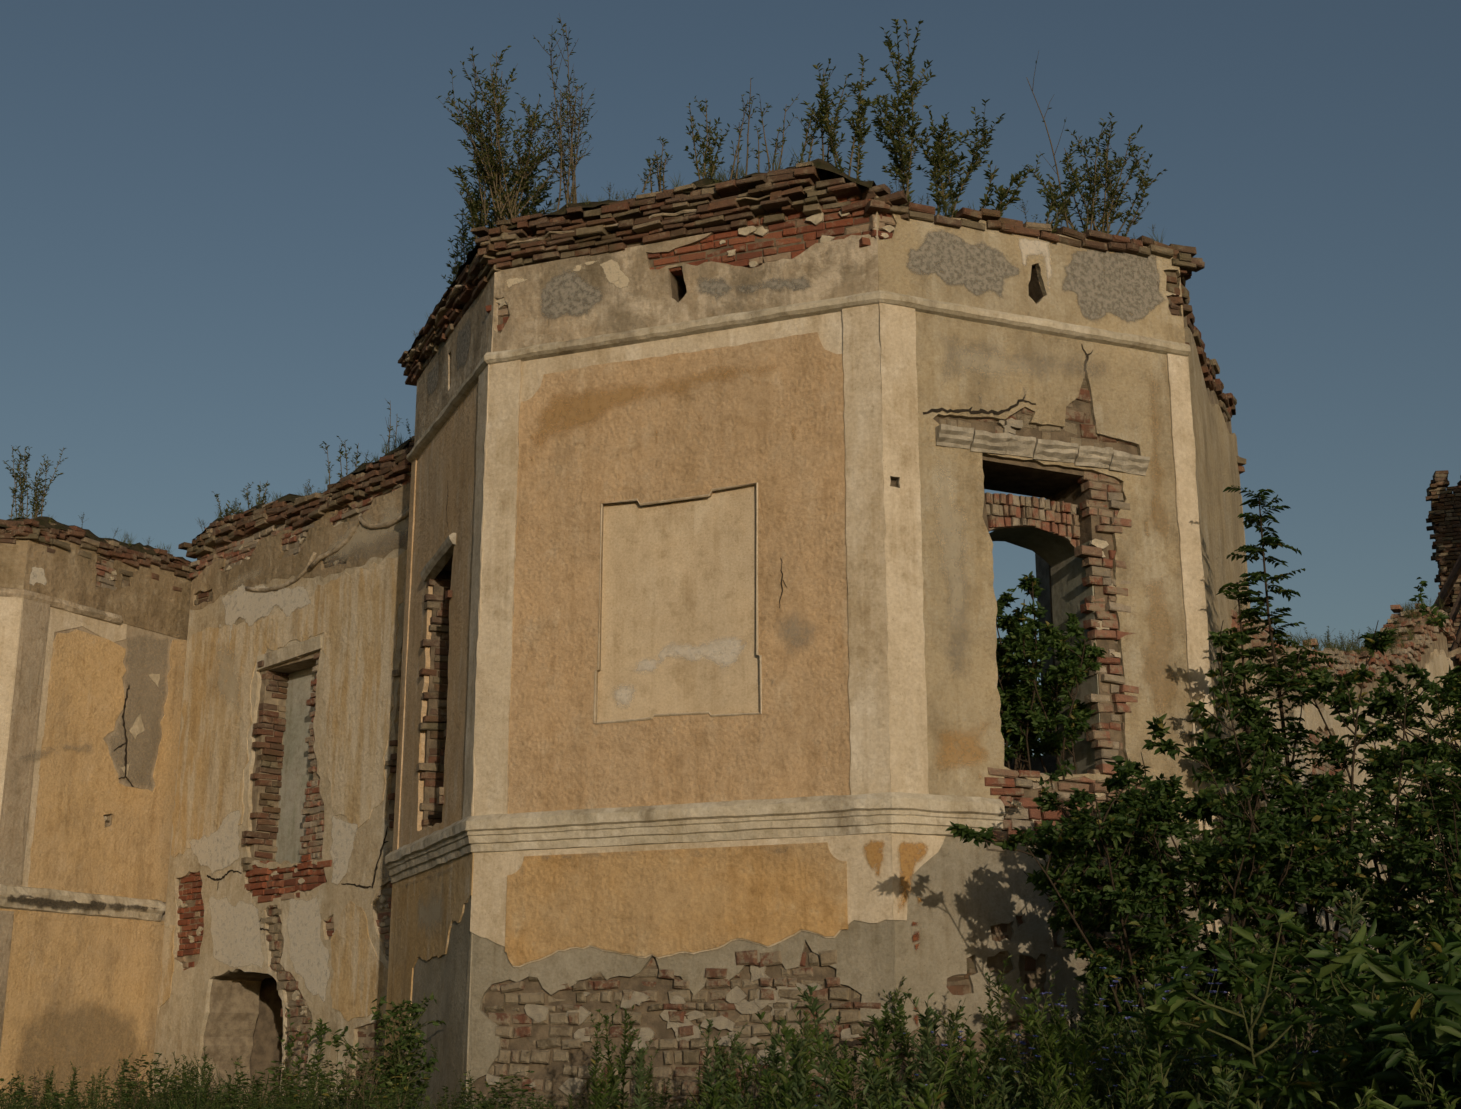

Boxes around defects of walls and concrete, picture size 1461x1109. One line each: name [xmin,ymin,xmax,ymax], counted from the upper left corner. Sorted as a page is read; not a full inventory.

spalling [648,197,895,276]
spalling [940,374,1131,448]
peeling [323,496,407,568]
peeling [194,524,311,644]
spalling [984,471,1149,852]
crack [114,685,140,789]
spalling [129,714,145,739]
peeling [174,810,358,1105]
spalling [376,882,392,955]
spalling [947,916,1060,995]
spalling [474,942,1046,1109]